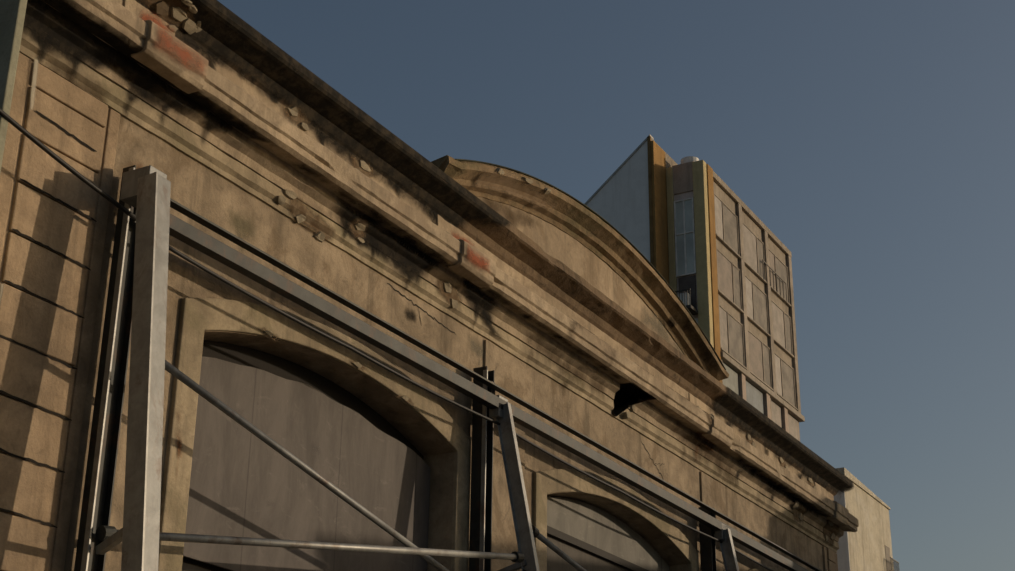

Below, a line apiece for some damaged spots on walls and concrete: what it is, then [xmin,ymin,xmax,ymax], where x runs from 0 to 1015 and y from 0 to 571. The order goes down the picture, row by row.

spalling [145,0,202,35]
water stain [31,36,48,109]
water stain [135,0,522,228]
crack [387,283,456,335]
spalling [612,383,650,419]
water stain [713,387,854,494]